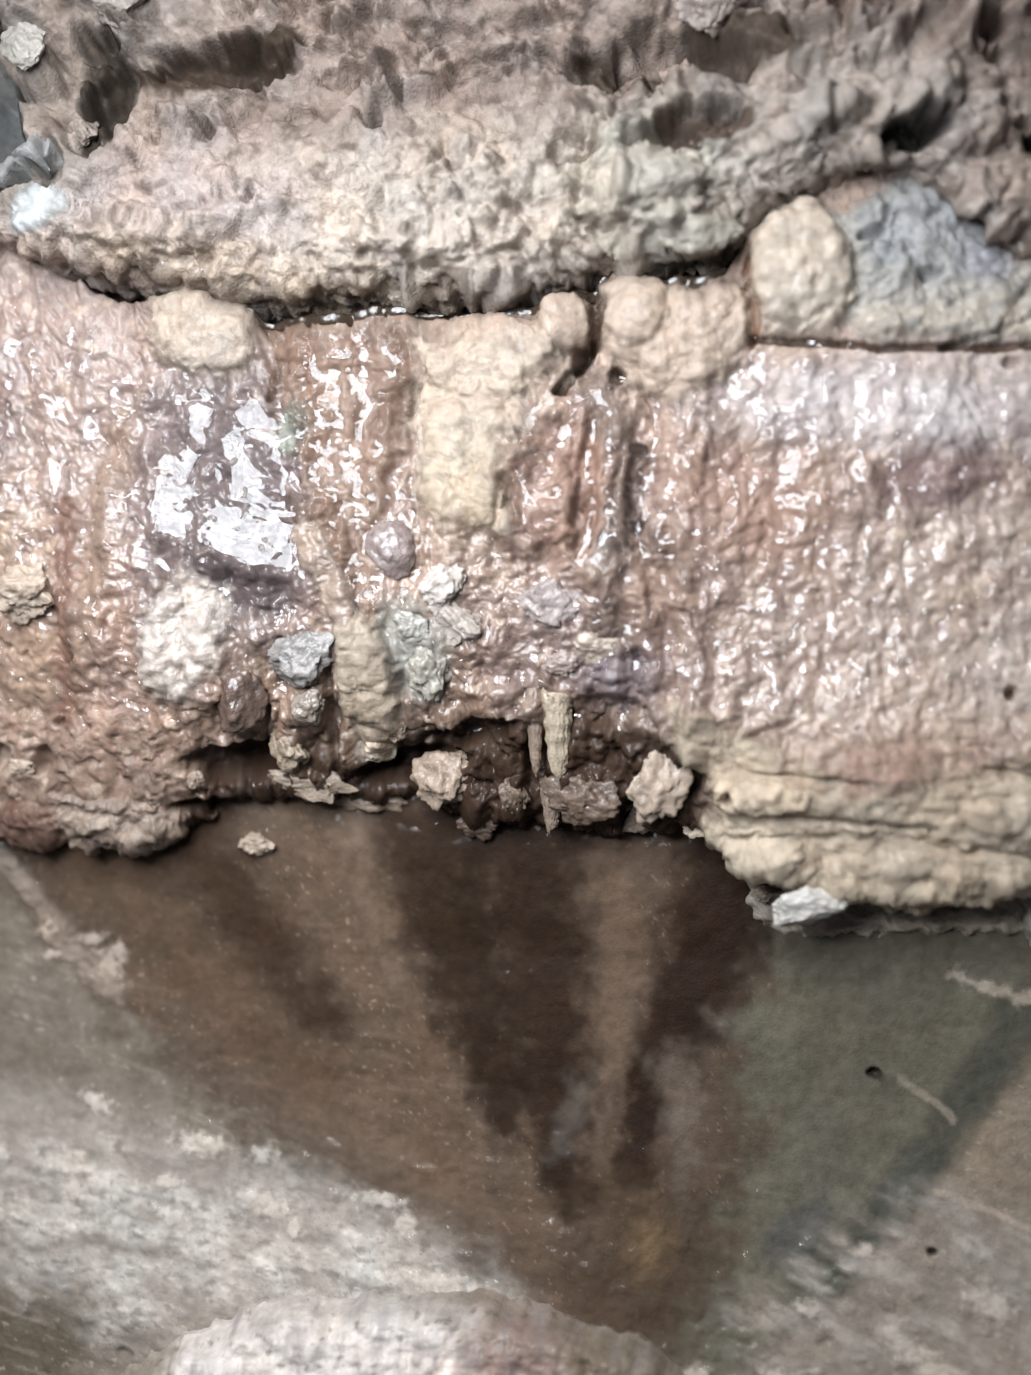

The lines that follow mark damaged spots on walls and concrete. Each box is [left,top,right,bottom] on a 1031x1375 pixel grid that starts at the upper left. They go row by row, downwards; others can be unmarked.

spalling [0,68,66,231]
leakage [729,365,1031,446]
leakage [154,382,312,613]
leakage [372,603,443,692]
leakage [953,617,1031,707]
peeling [669,702,1031,947]
leakage [0,639,1031,1375]